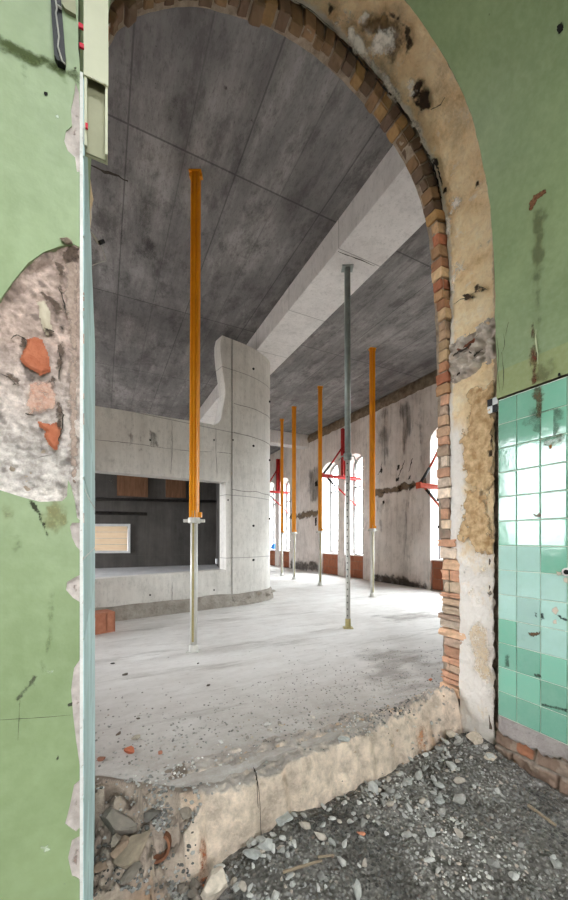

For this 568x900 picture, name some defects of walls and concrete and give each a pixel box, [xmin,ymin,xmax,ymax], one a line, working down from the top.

leakage [0,36,78,79]
peeling [348,12,414,102]
spalling [64,83,83,176]
rust [529,189,546,211]
spalling [0,237,84,552]
spalling [448,318,497,384]
rust [531,329,543,418]
peeling [457,375,500,731]